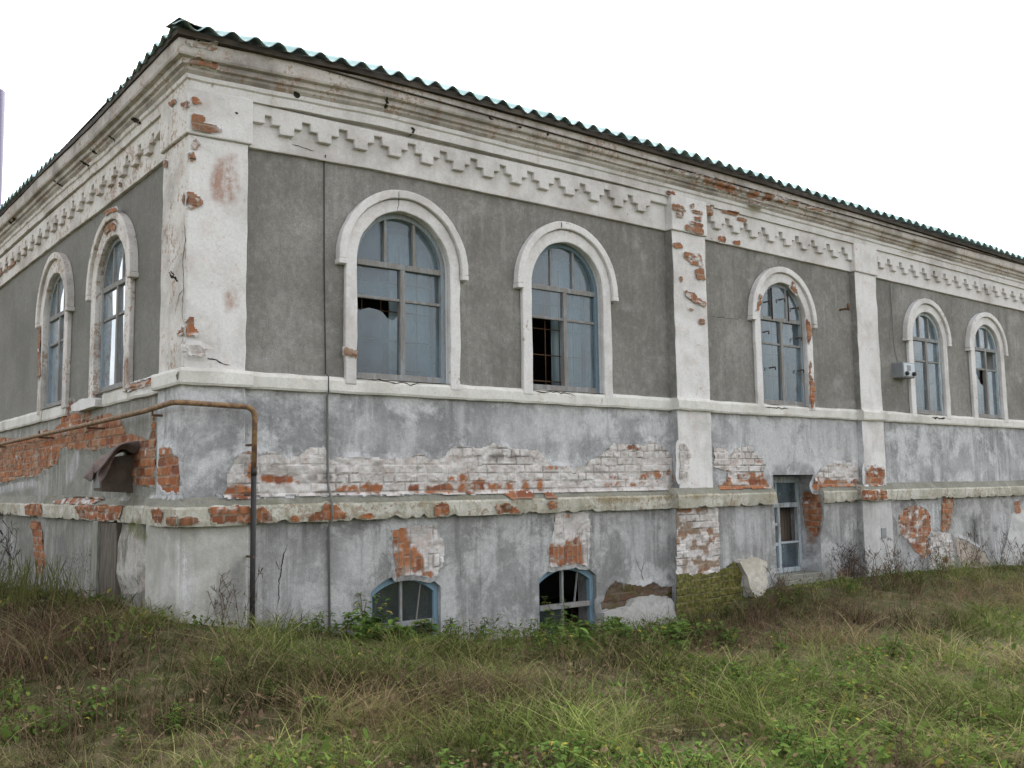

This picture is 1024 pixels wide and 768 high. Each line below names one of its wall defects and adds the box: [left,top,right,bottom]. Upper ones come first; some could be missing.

peeling [168,95,223,164]
peeling [181,163,232,211]
crack [169,226,186,319]
spalling [665,167,833,326]
spalling [0,397,184,501]
spalling [386,520,448,583]
spalling [216,436,693,501]
spalling [544,509,594,572]
spalling [595,507,749,620]
spalling [712,442,772,490]
spalling [801,459,886,539]
spalling [896,496,990,570]